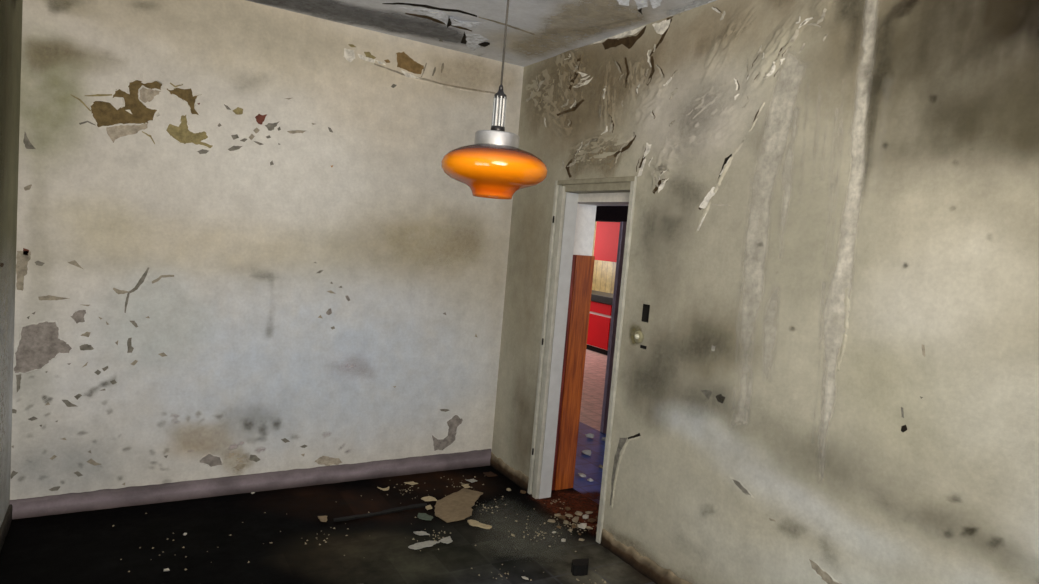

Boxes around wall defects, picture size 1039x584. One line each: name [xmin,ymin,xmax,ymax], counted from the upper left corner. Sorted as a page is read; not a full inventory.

peeling [344,44,425,88]
flaking render [560,0,726,127]
peeling [734,8,828,108]
flaking render [71,79,215,154]
peeling [228,114,314,151]
peeling [615,132,669,193]
flaking render [13,295,117,392]
peeling [115,316,150,365]
flaking render [431,409,463,451]
peeling [610,433,641,508]
spalling [808,558,842,584]